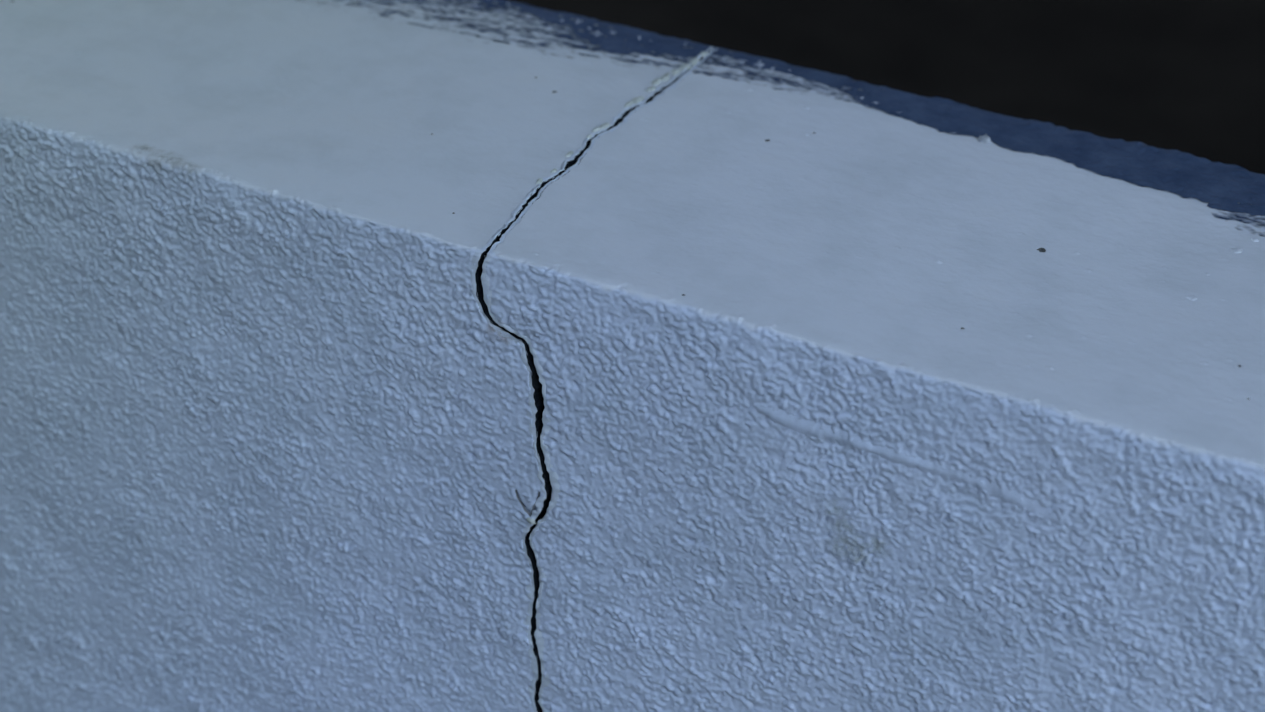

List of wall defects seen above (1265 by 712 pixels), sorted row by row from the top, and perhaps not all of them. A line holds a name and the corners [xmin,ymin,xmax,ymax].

crack [470,47,718,712]